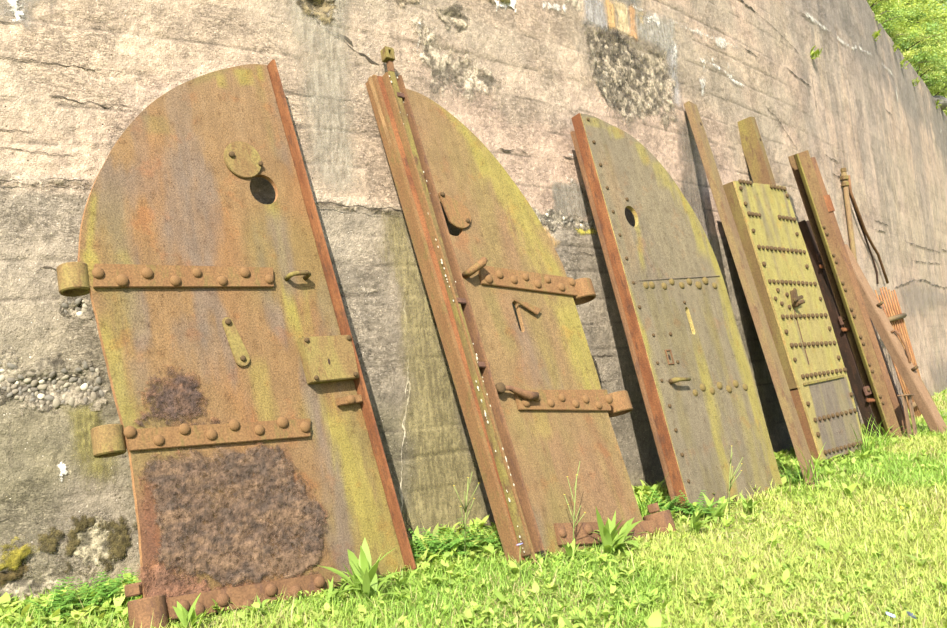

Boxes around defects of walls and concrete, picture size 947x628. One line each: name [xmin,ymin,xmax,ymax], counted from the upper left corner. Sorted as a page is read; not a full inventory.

water stain [4,0,33,23]
spalling [296,0,337,26]
crack [314,17,379,65]
spalling [584,20,676,131]
crack [741,0,817,108]
crack [896,243,947,289]